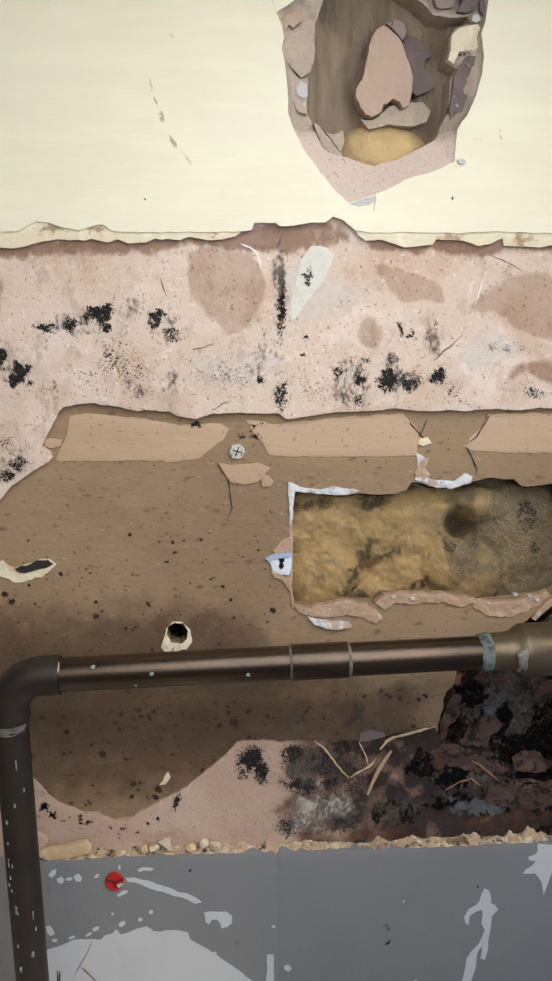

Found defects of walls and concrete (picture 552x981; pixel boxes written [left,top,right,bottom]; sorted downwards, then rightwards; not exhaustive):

flaking render [276,0,488,206]
peeling [0,221,241,249]
peeling [356,231,552,248]
damp [0,223,346,343]
mould [0,349,32,391]
damp [270,380,291,412]
mould [333,321,451,411]
spalling [0,559,56,583]
damp [130,781,162,800]
damp [234,671,552,839]
peeling [46,910,252,981]
peeling [462,888,498,981]